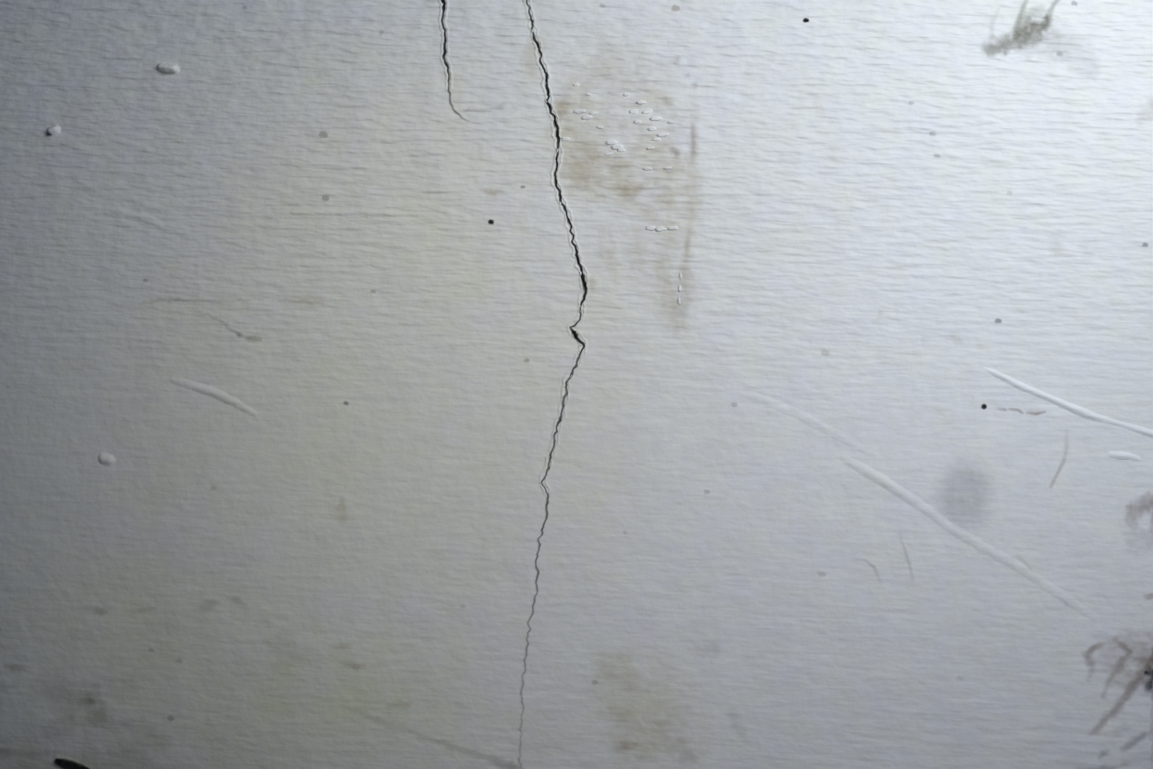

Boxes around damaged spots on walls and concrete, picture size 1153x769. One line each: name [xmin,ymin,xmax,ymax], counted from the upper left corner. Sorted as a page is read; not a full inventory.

crack [438,0,453,98]
crack [522,0,590,577]